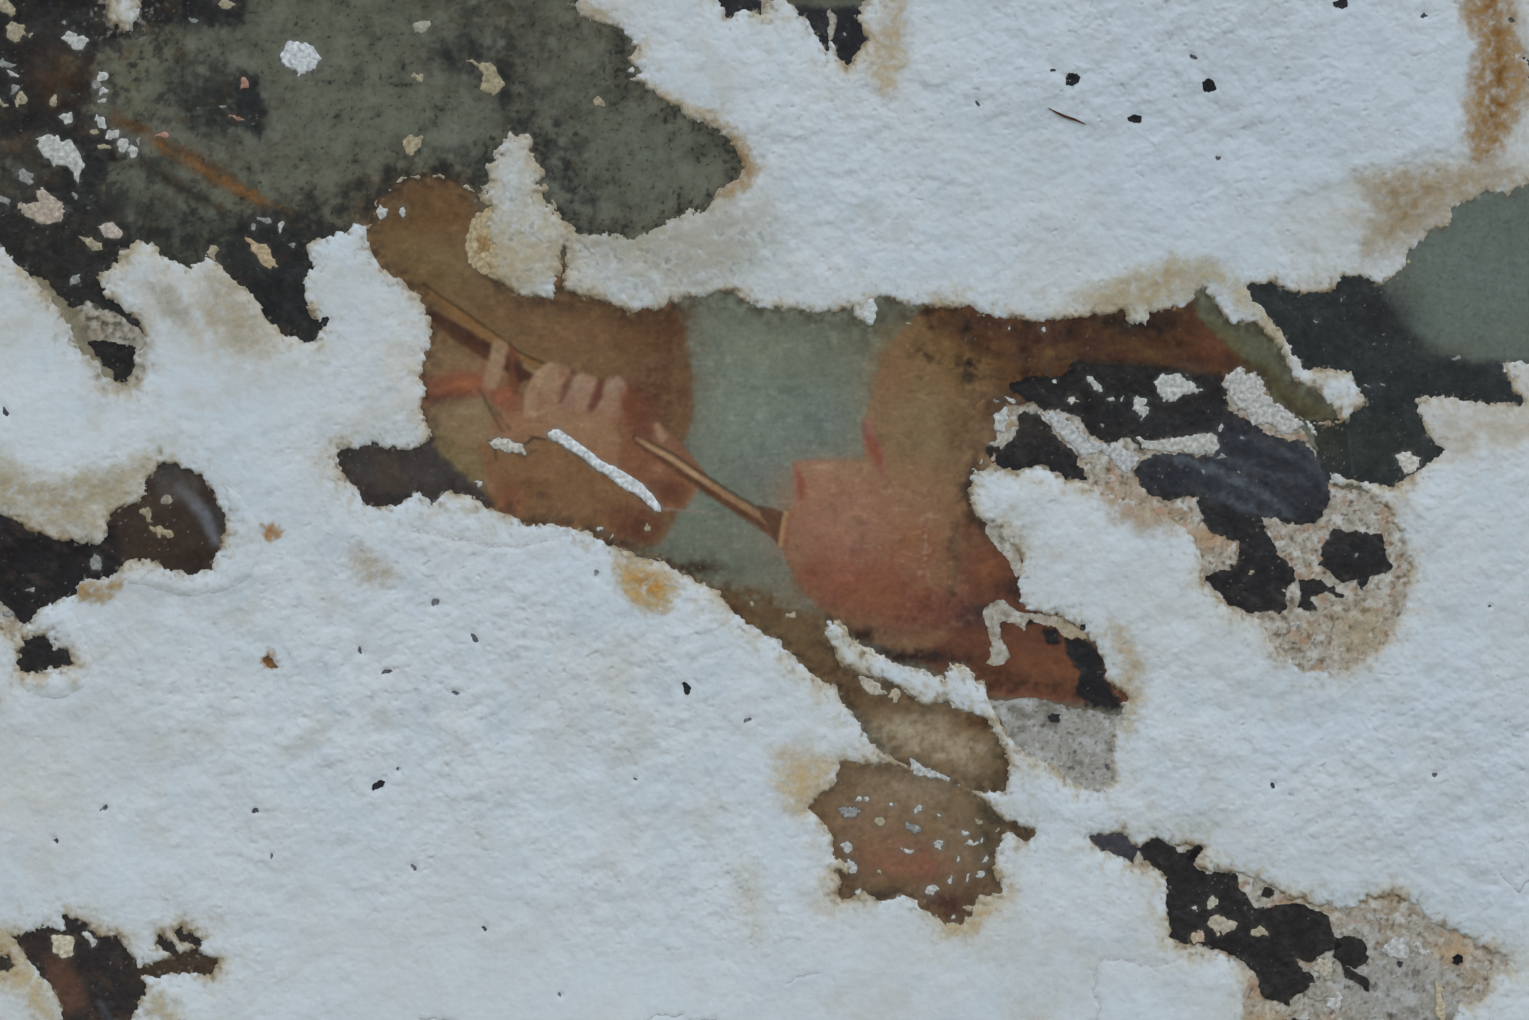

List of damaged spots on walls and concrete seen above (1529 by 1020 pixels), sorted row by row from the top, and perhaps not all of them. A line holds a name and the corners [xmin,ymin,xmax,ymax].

peeling [718,0,871,65]
peeling [0,0,744,387]
peeling [0,462,226,674]
peeling [337,183,1529,926]
peeling [0,914,218,1020]
peeling [1089,832,1508,1020]